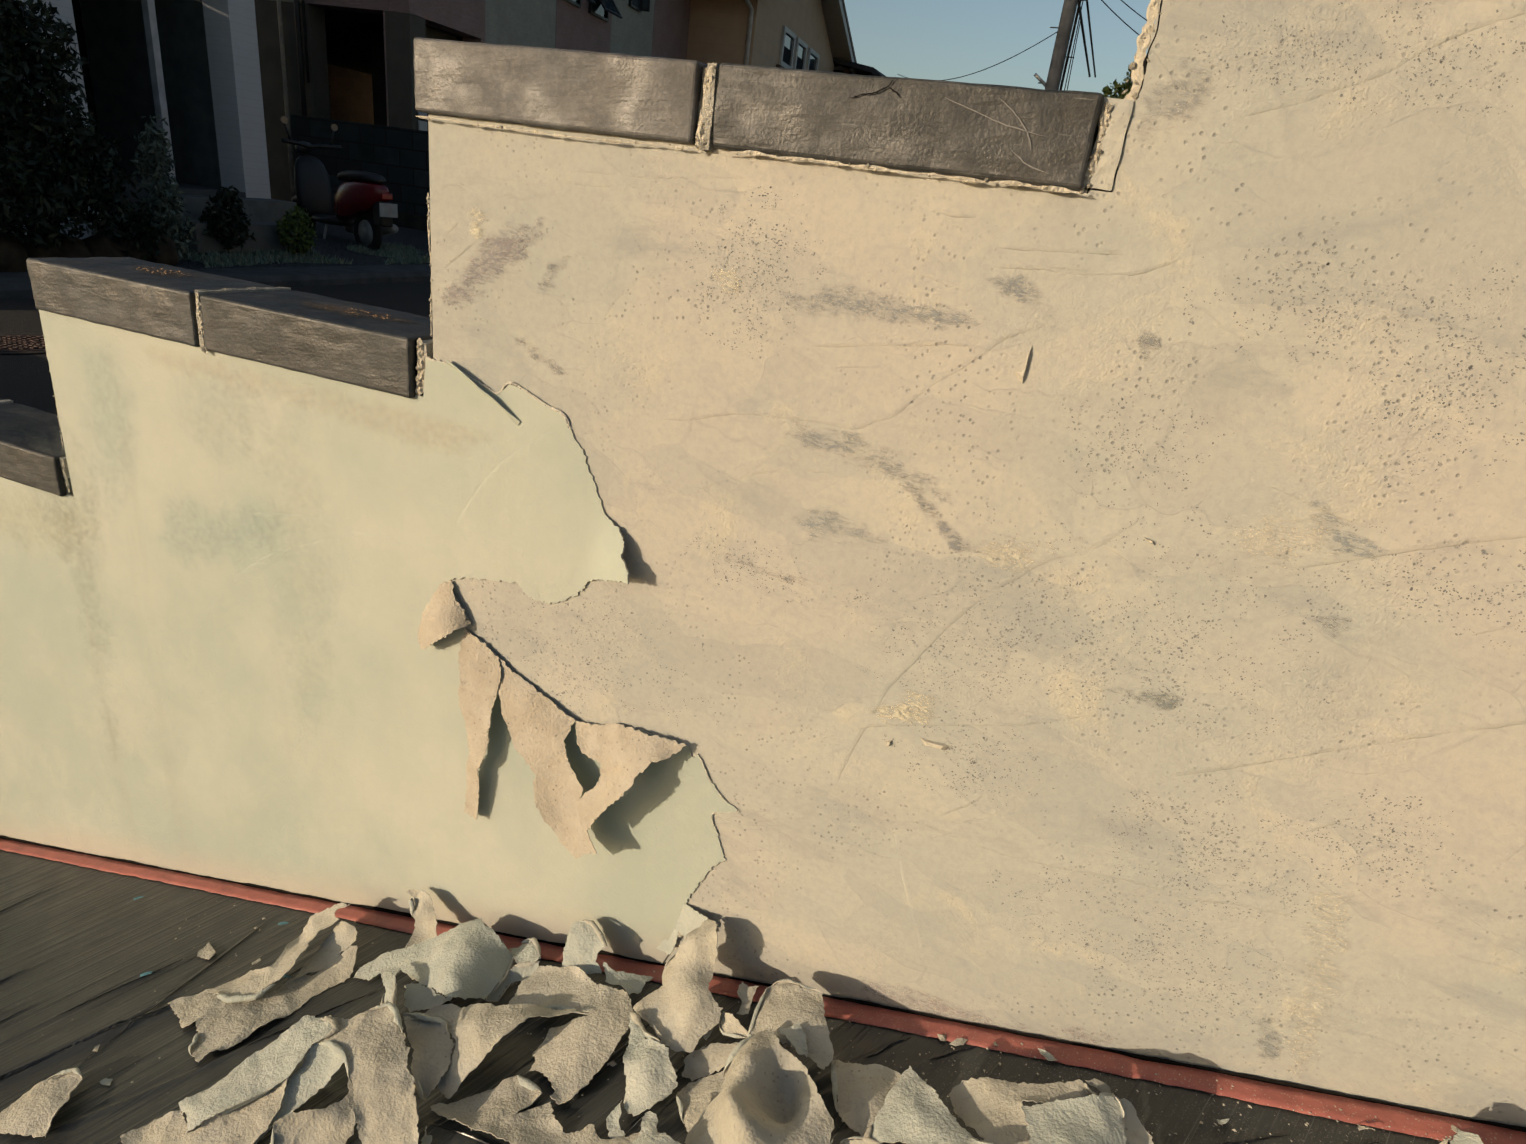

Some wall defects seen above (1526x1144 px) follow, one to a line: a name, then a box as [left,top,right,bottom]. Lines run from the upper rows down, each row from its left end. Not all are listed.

peeling [0,186,1154,1144]